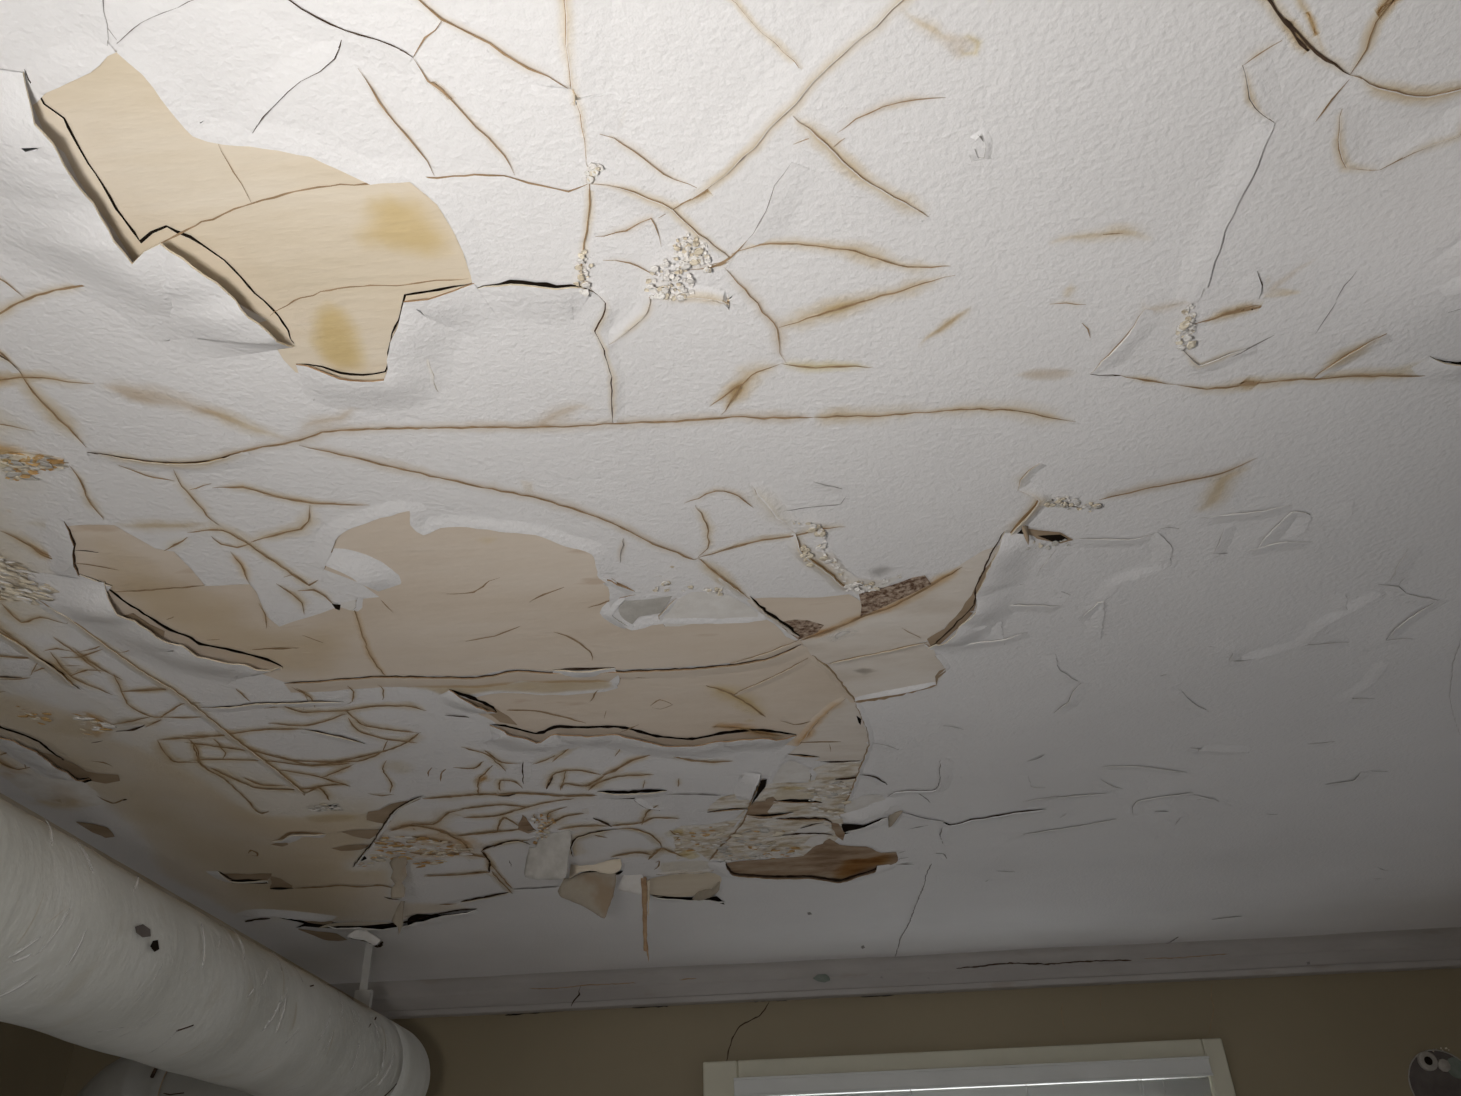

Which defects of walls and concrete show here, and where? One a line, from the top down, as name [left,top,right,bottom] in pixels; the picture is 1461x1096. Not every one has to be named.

peeling [0,32,593,413]
crack [0,0,1076,637]
peeling [1090,309,1176,385]
peeling [1207,271,1263,322]
crack [1180,333,1461,390]
peeling [0,450,69,481]
crack [0,599,731,901]
peeling [0,458,1256,905]
peeling [204,796,512,948]
crack [860,758,1046,956]
crack [505,978,696,1016]
crack [956,916,1241,985]